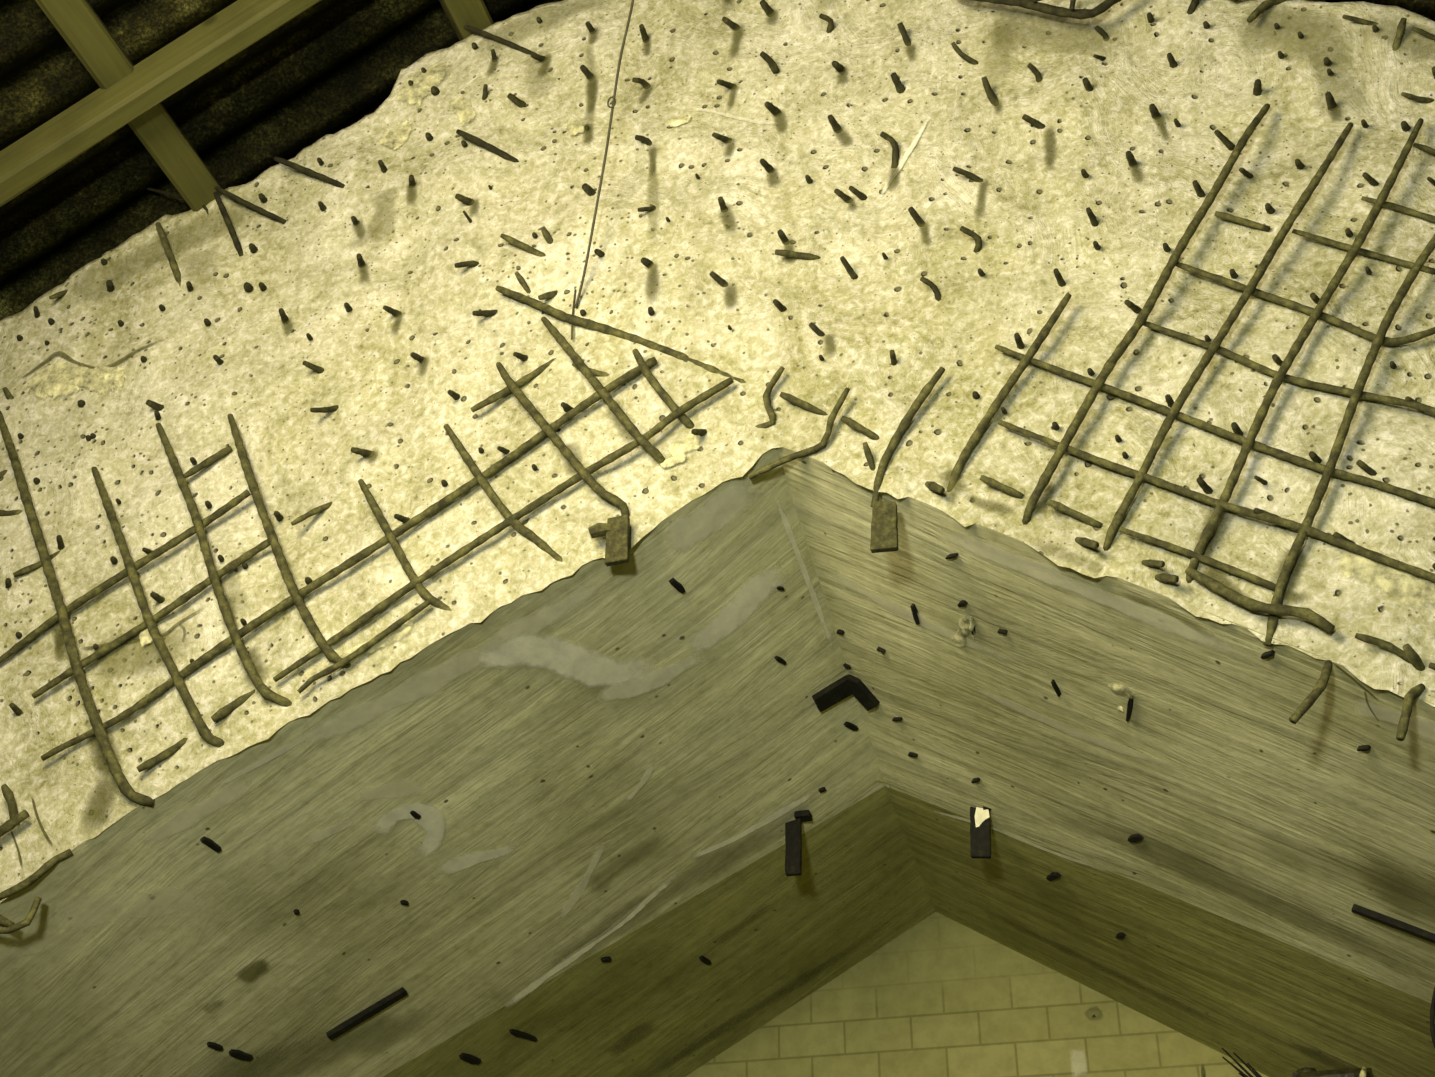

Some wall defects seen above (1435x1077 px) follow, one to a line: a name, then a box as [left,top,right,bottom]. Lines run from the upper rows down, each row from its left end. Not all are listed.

corrosion [584,78,596,141]
corrosion [721,210,734,229]
corrosion [889,168,898,187]
corrosion [976,182,986,214]
corrosion [647,263,657,296]
corrosion [725,285,734,306]
spalling [495,271,746,383]
peeling [669,366,945,549]
spalling [291,501,333,526]
spalling [1340,543,1435,605]
peeling [478,568,781,700]
spalling [1355,633,1435,741]